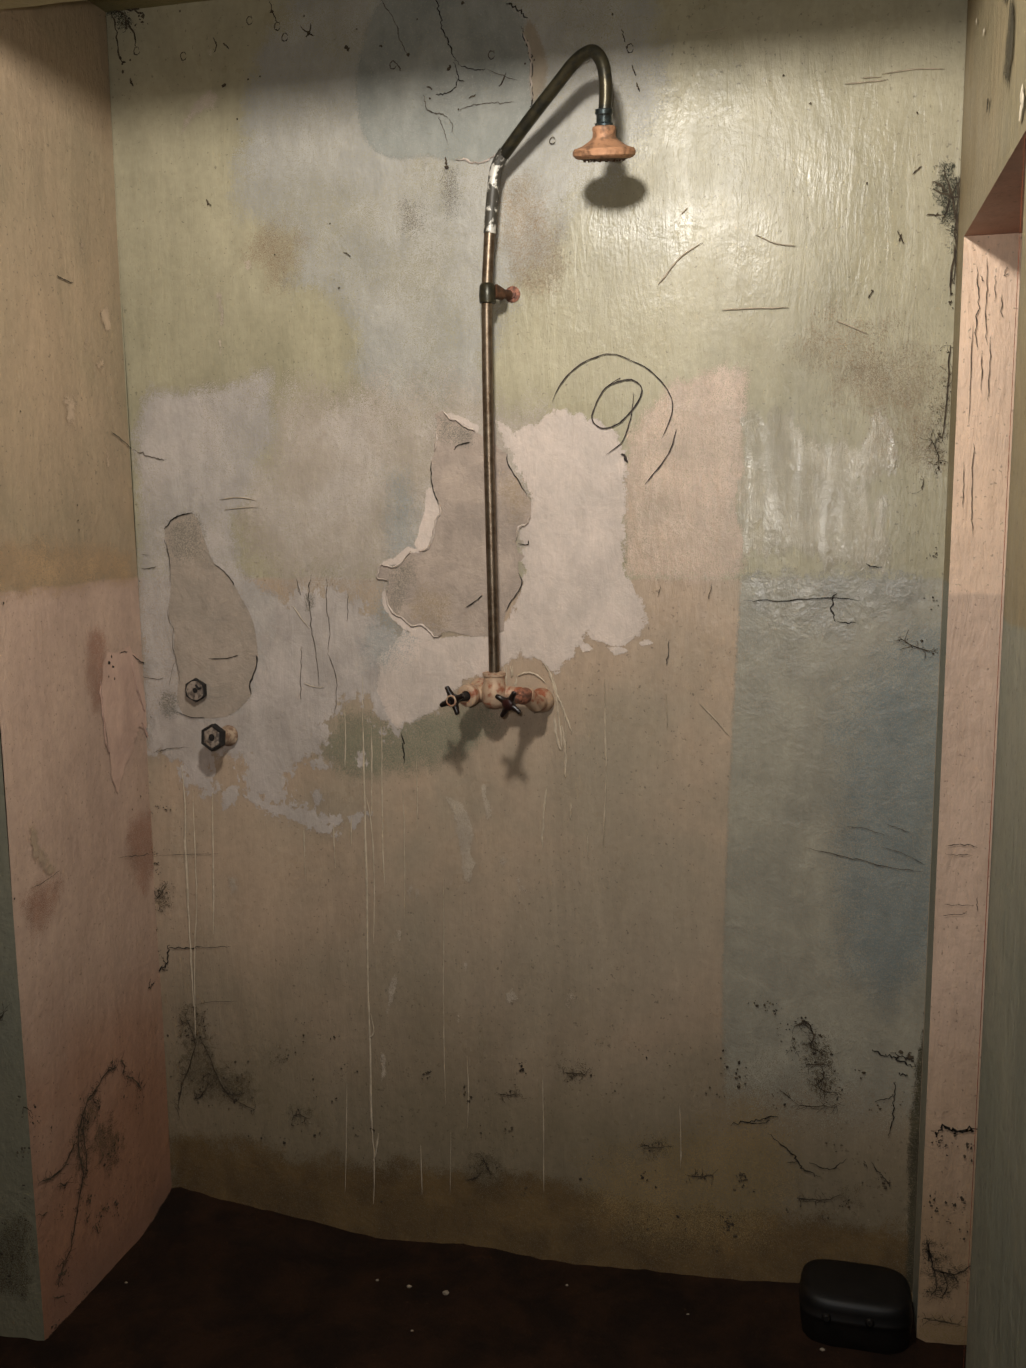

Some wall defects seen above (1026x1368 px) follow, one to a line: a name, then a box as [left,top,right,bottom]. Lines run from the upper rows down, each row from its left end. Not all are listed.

crack [423,0,533,140]
leakage [926,159,960,309]
peeling [99,0,678,841]
crack [750,594,860,624]
leakage [0,597,974,1338]
crack [731,1049,916,1187]
crack [933,1124,977,1137]